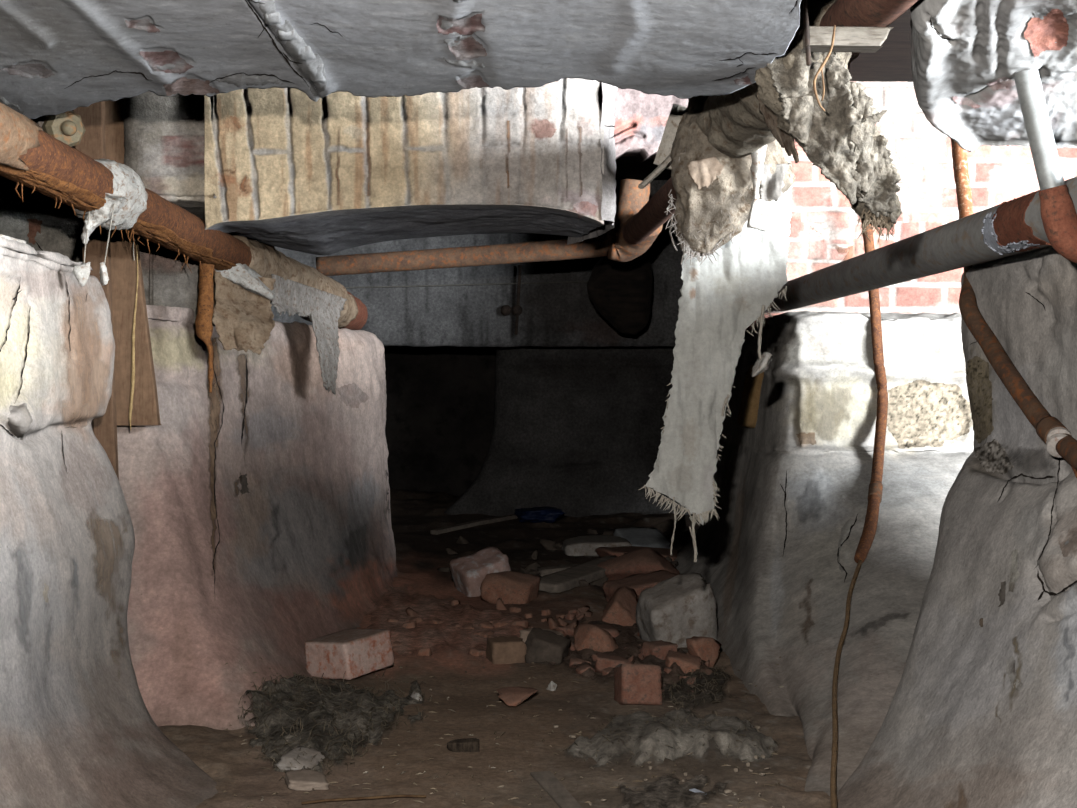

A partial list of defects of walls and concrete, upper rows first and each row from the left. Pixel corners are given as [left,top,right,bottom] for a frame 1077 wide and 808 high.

crack [65,70,153,89]
peeling [139,50,283,96]
peeling [1024,8,1069,57]
crack [0,277,31,438]
spalling [887,356,1014,475]
crack [779,471,787,554]
crack [837,514,858,582]
crack [998,458,1077,600]
damp [16,550,32,641]